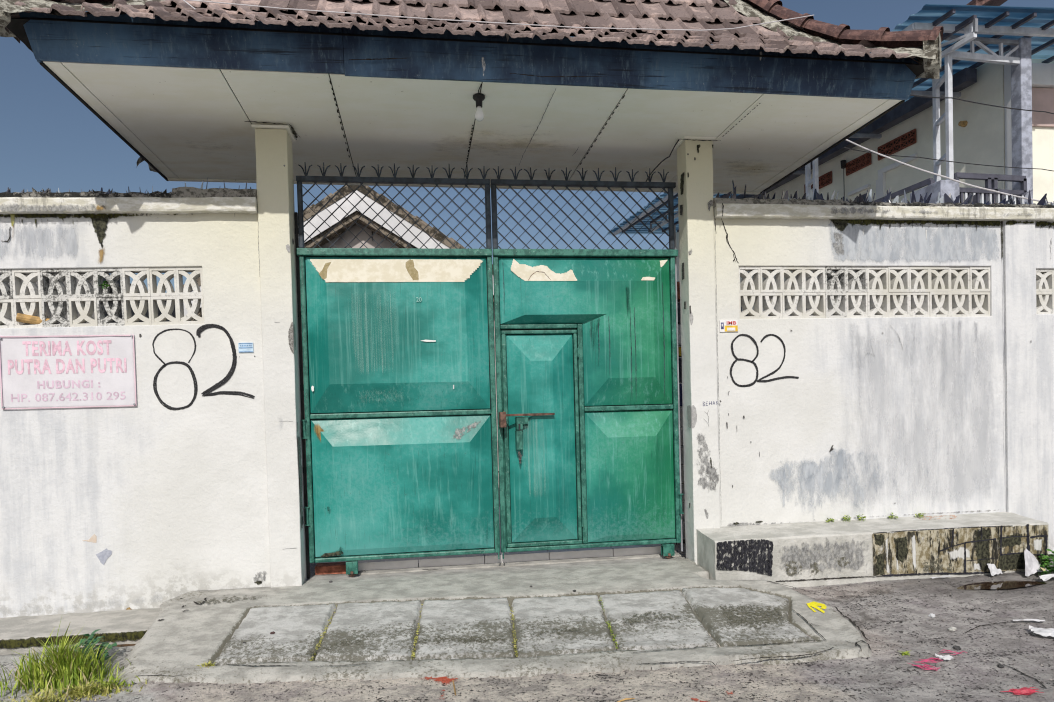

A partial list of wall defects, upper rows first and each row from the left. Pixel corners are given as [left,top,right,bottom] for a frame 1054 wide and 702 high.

damp [0,204,108,263]
damp [830,207,997,262]
crack [704,203,738,489]
damp [771,450,879,505]
damp [781,525,1048,576]